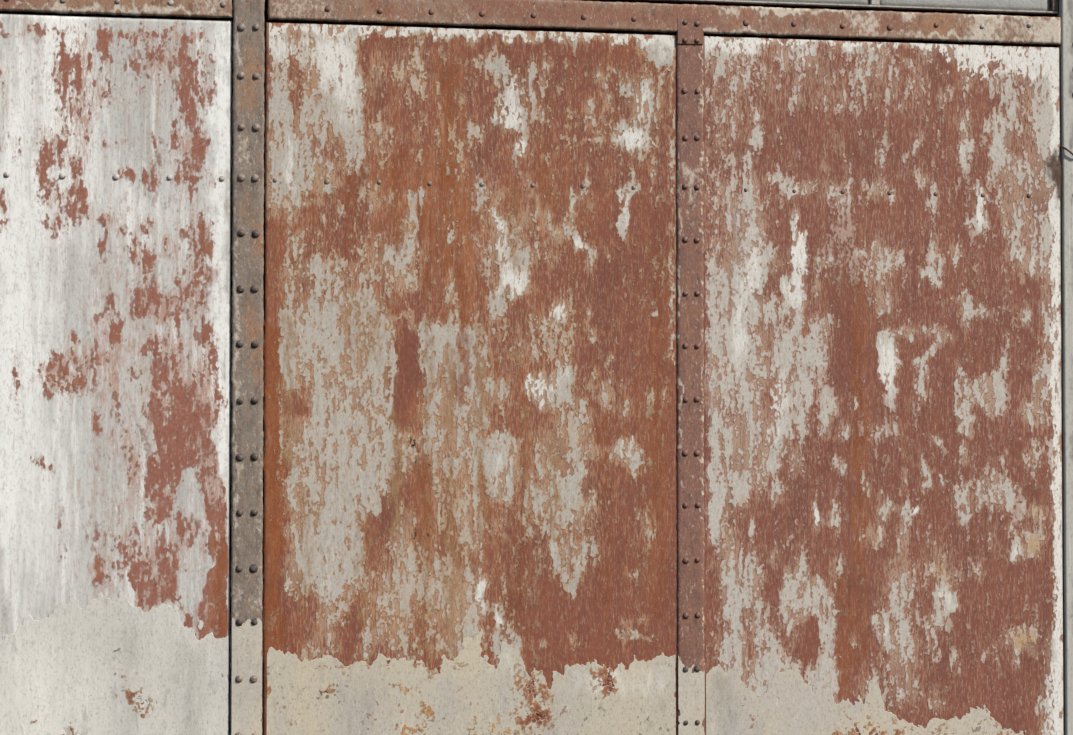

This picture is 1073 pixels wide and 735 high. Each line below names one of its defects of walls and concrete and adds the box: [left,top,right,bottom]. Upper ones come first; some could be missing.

rust [1046,151,1062,198]
peeling [704,36,1063,735]
rust [264,327,282,648]
rust [314,665,351,699]
rust [392,683,435,735]
rust [468,663,566,735]
rust [590,665,618,709]
rust [832,710,918,735]